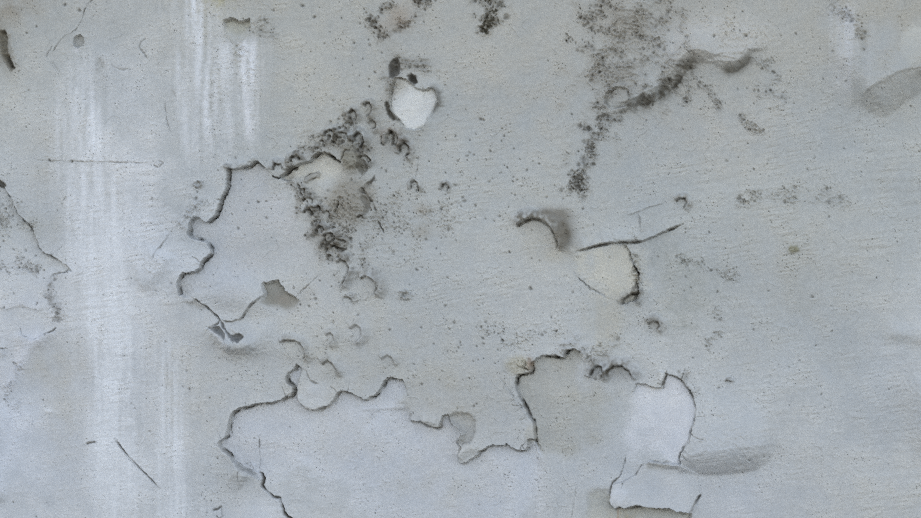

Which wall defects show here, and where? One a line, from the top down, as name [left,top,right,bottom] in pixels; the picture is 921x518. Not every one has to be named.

spalling [0,30,21,73]
crack [45,0,94,75]
spalling [376,55,452,139]
peeling [174,119,378,319]
peeling [214,321,703,518]
crack [257,435,292,518]